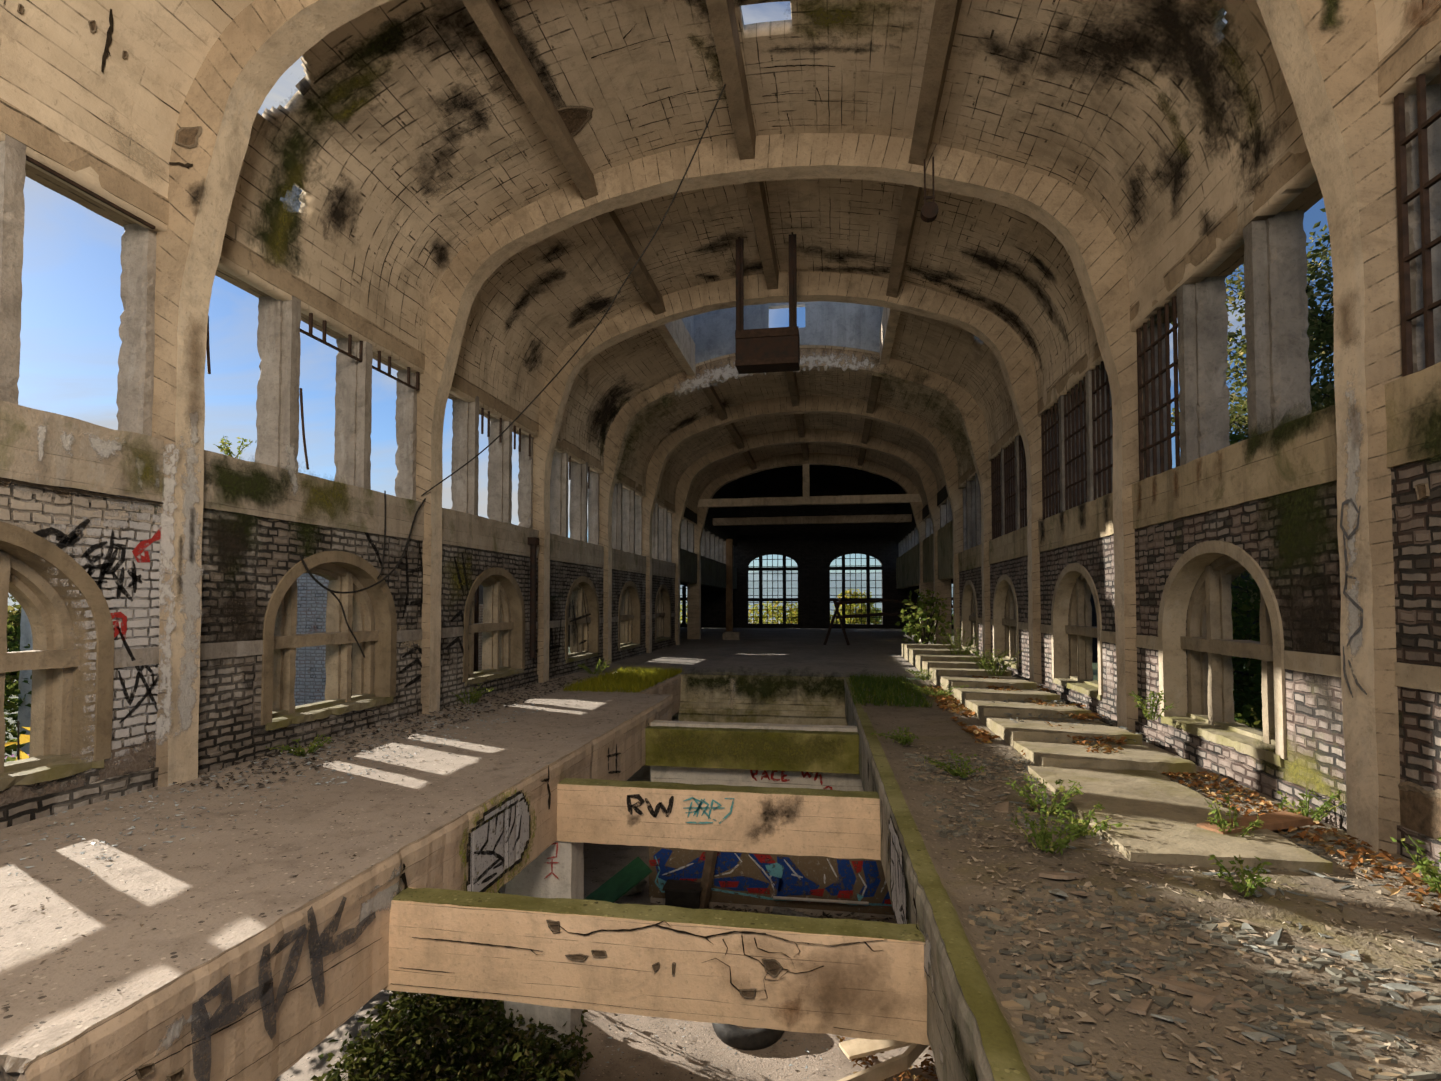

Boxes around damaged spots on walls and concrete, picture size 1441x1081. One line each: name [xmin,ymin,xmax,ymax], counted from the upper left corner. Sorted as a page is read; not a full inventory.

crack [101,9,113,72]
damp [495,0,560,107]
damp [979,37,1038,75]
damp [409,0,521,193]
damp [1045,0,1277,190]
damp [327,186,359,231]
damp [1130,177,1142,222]
damp [1156,152,1188,216]
damp [432,243,449,267]
crack [400,864,409,890]
crack [124,888,920,1081]